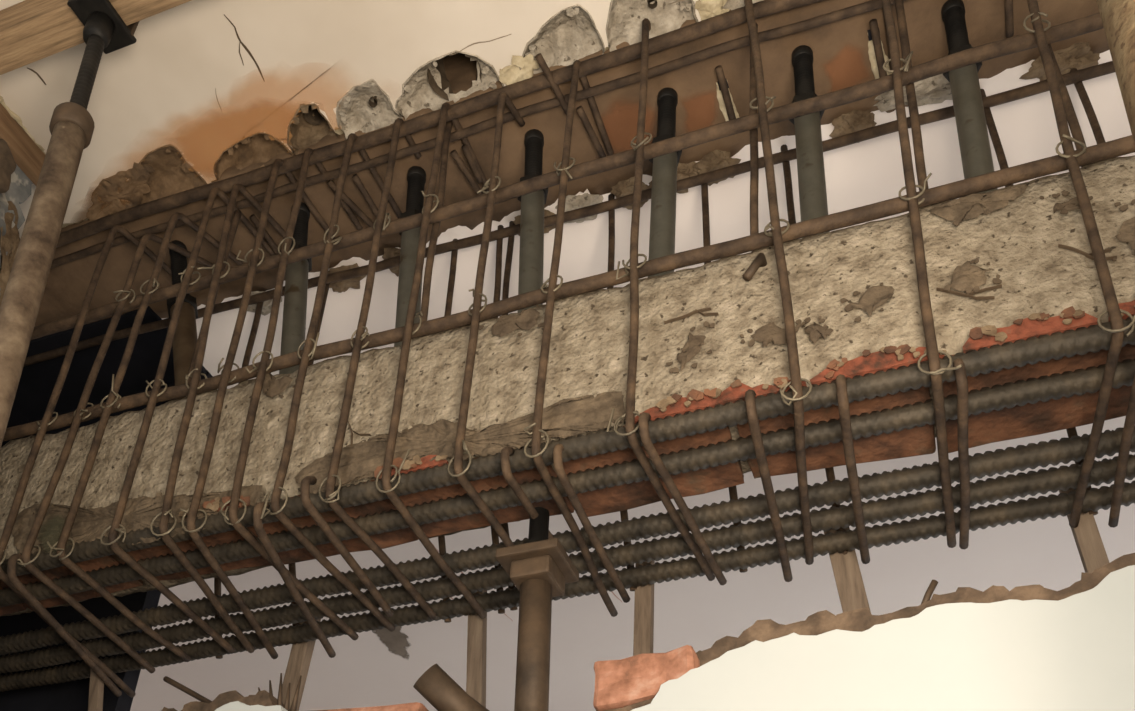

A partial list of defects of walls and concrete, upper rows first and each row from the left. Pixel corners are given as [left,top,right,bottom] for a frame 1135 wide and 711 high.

crack [224,15,265,82]
spalling [0,0,1135,442]
spalling [0,300,1135,697]